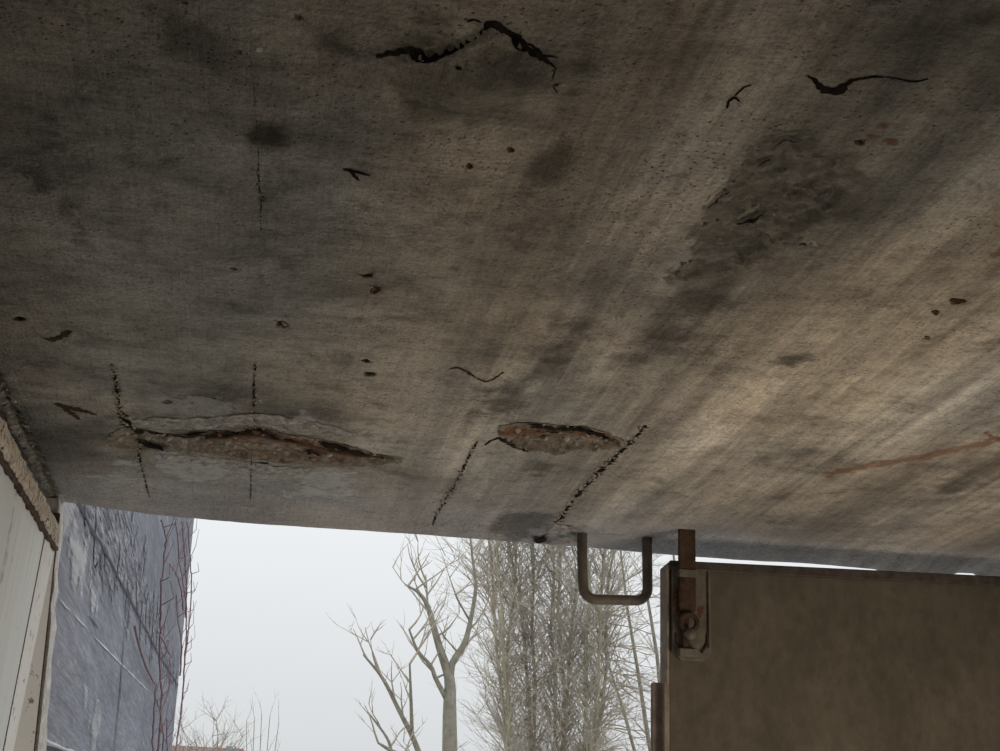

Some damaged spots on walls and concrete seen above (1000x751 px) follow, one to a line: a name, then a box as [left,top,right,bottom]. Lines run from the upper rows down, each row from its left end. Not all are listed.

crack [375,19,559,93]
crack [726,85,751,109]
crack [807,75,928,96]
crack [449,367,504,382]
crack [54,364,150,497]
crack [208,362,262,499]
spalling [107,414,403,467]
crack [432,437,529,526]
spalling [497,422,626,456]
crack [554,425,647,523]